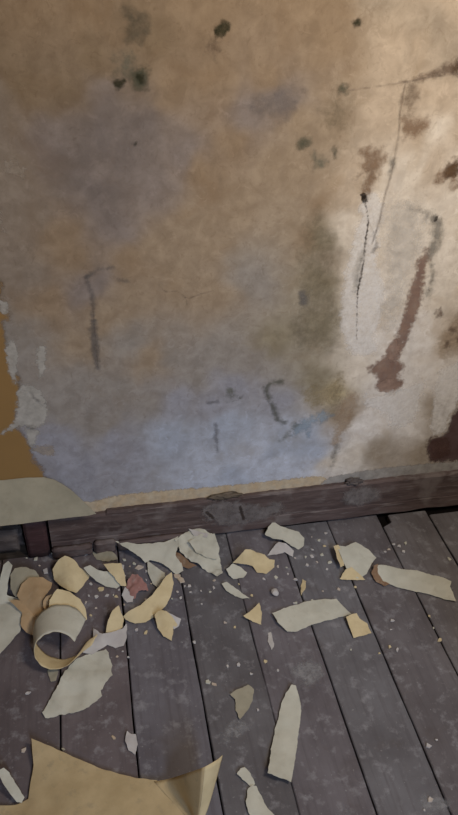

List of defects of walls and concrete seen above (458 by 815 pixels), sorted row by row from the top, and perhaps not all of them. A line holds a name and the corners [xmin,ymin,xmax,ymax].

damp [114,70,147,88]
damp [214,22,230,36]
peeling [0,0,458,512]
crack [357,194,369,295]
rust [368,216,441,392]